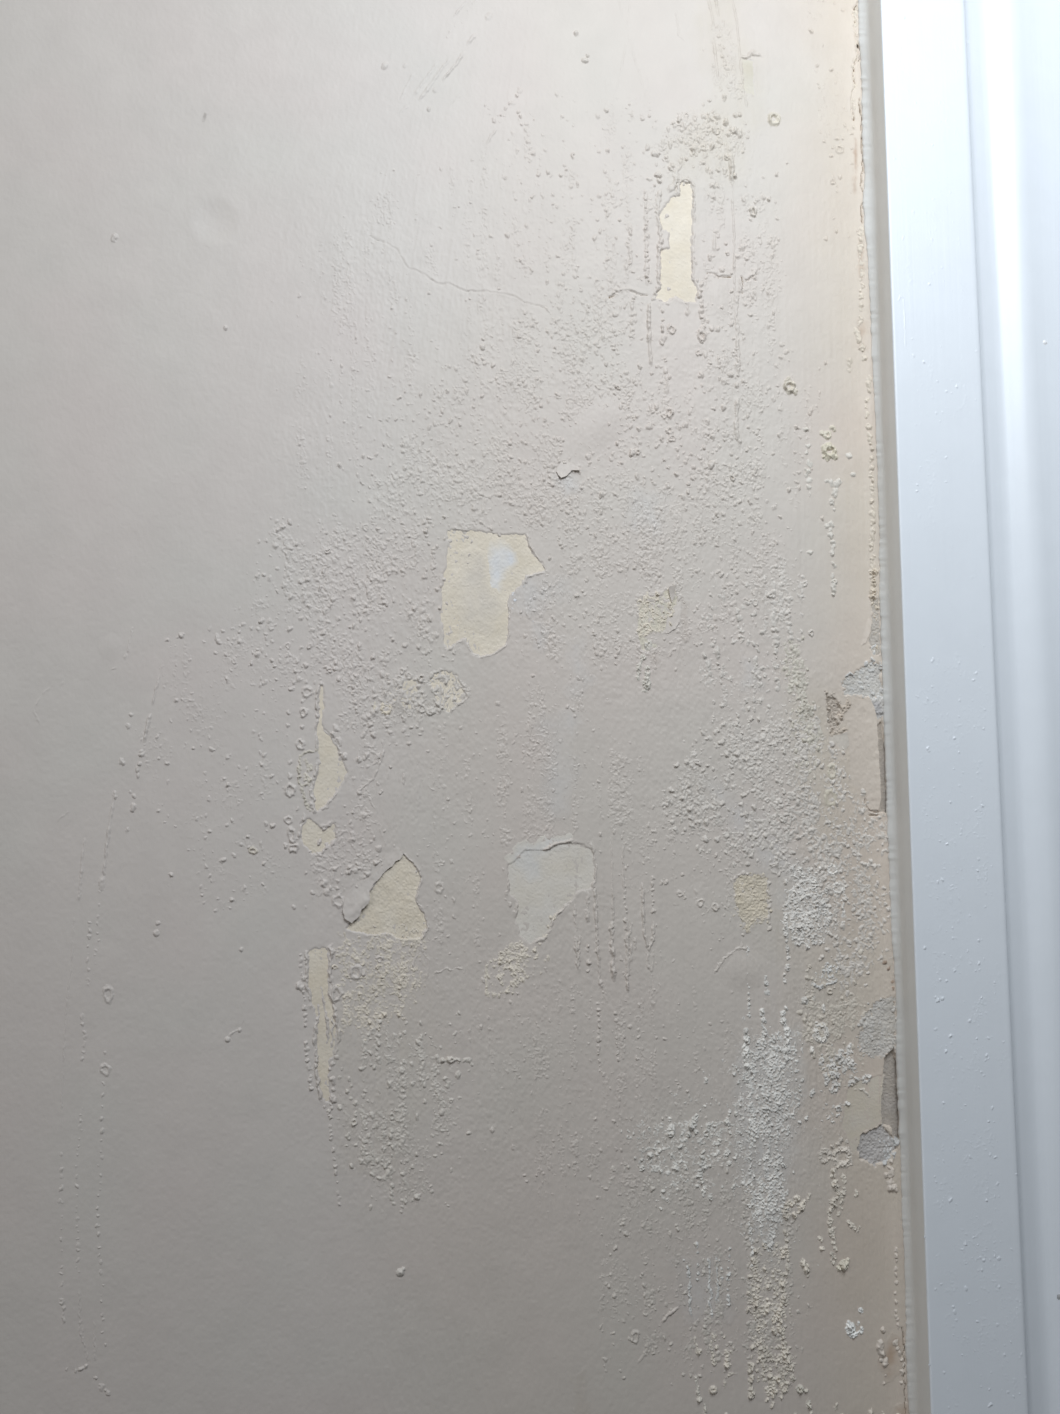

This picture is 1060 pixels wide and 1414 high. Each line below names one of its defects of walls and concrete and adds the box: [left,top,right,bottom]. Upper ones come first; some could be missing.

peeling [643,158,707,346]
peeling [296,685,347,858]
peeling [373,668,472,723]
peeling [430,530,548,659]
peeling [824,567,884,810]
peeling [484,832,598,999]
peeling [295,846,464,1206]
flaking render [855,960,900,1167]